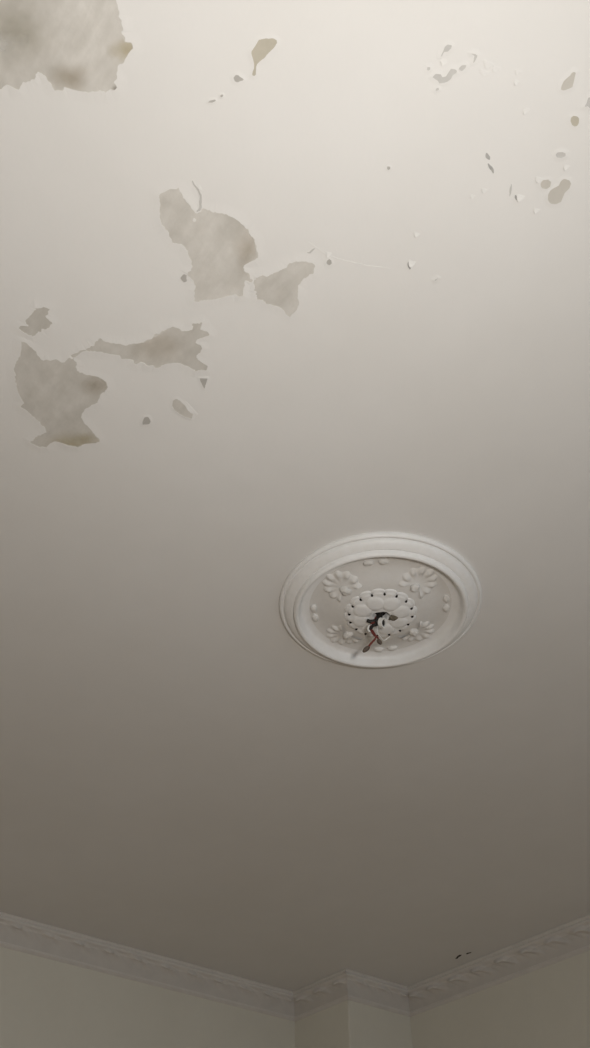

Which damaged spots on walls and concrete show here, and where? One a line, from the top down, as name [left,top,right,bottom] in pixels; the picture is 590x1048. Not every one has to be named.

peeling [0,0,144,105]
peeling [206,33,282,105]
peeling [536,174,575,208]
peeling [5,178,336,454]